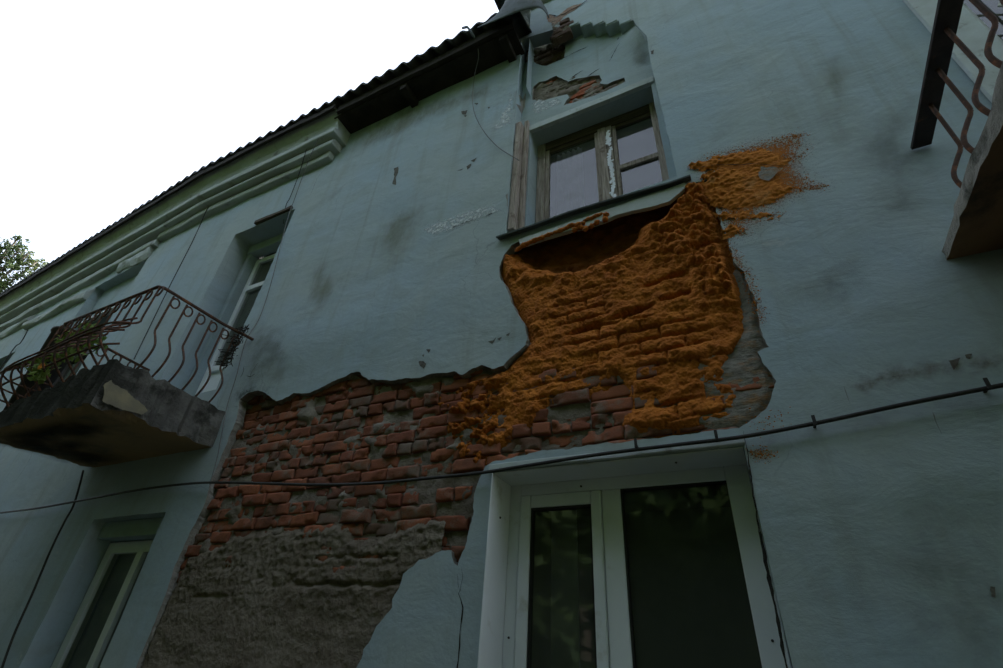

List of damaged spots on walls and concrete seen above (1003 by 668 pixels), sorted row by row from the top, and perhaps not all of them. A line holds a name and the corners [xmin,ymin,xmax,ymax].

spalling [525,0,587,66]
spalling [513,76,625,114]
peeling [605,130,616,198]
spalling [758,166,780,180]
spalling [515,197,680,273]
spalling [141,270,775,668]
crack [456,574,464,668]